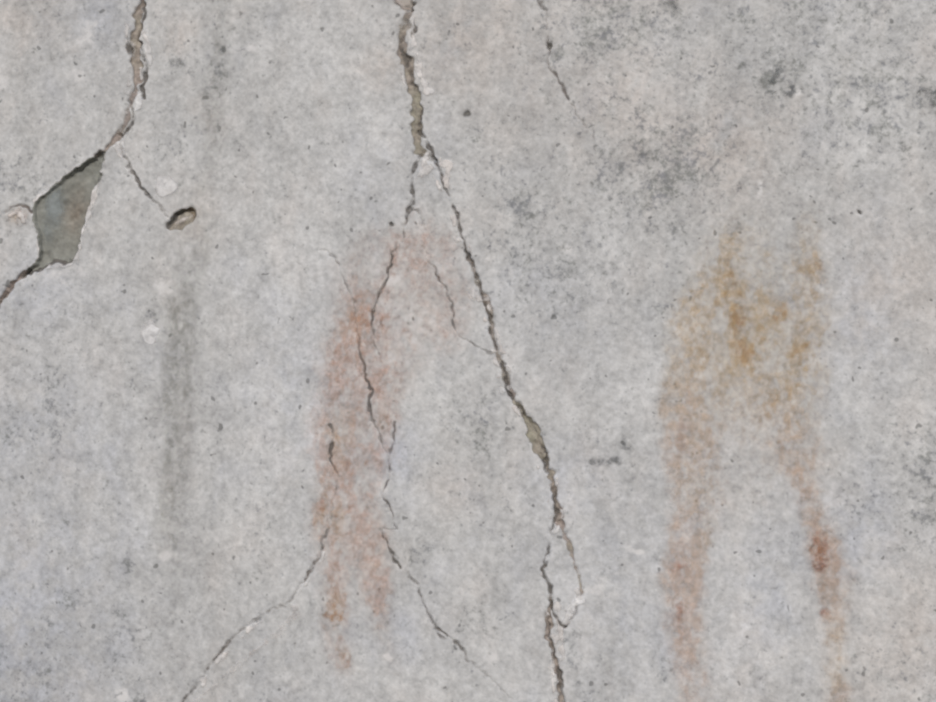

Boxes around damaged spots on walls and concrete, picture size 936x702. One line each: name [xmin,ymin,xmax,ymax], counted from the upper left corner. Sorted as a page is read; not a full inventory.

crack [94,0,153,198]
spalling [8,150,107,277]
crack [0,270,32,304]
crack [371,254,393,325]
crack [359,352,374,417]
crack [397,7,585,702]
crack [327,424,335,464]
crack [291,536,325,618]
crack [182,620,276,702]